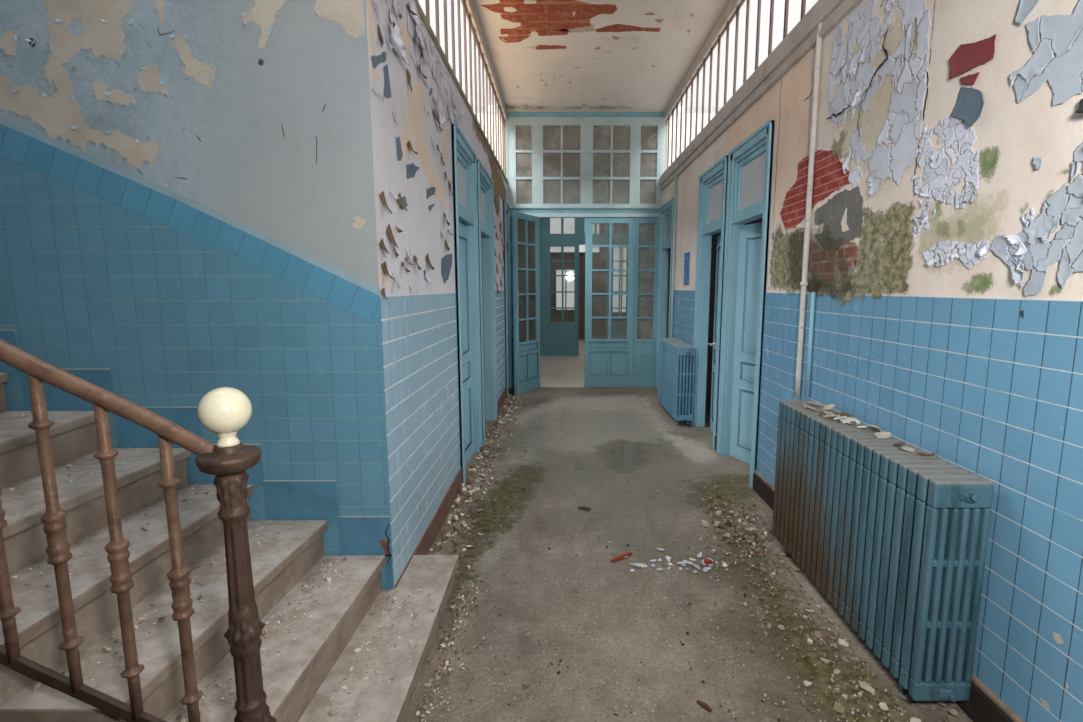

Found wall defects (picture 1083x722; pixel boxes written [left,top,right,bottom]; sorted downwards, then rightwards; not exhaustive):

peeling [0,0,168,176]
peeling [174,34,216,87]
peeling [240,0,298,65]
peeling [313,0,466,300]
flaking render [481,0,694,60]
peeling [725,0,996,280]
peeling [922,142,1083,297]
peeling [1009,0,1083,113]